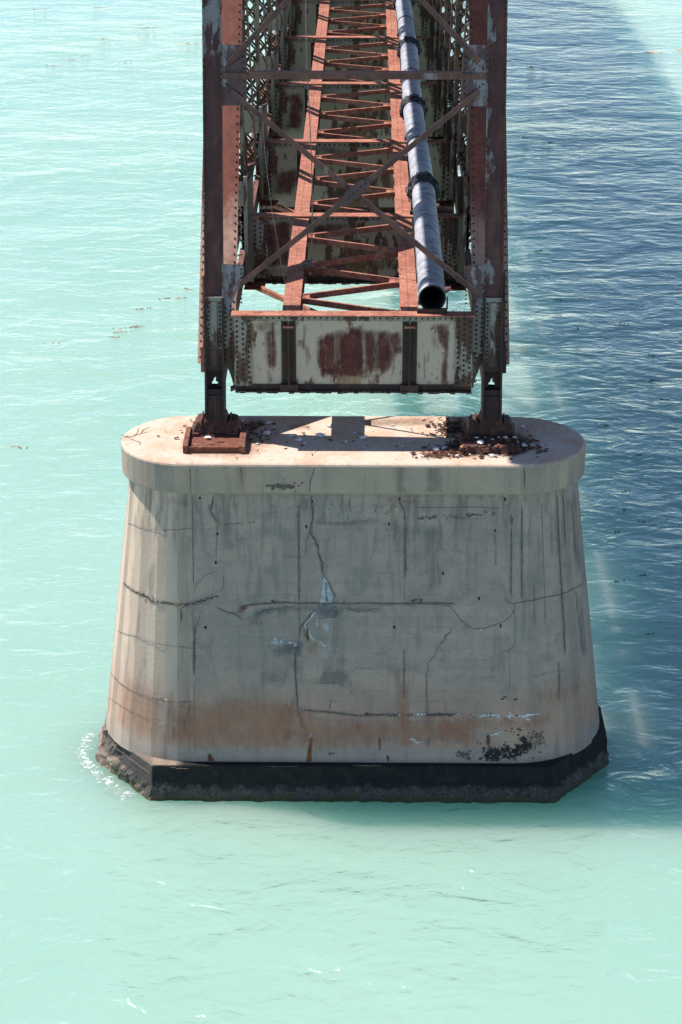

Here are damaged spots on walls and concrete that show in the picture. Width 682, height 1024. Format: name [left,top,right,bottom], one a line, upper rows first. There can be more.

rust [288,95,303,128]
rust [278,171,297,193]
rust [268,222,289,266]
rust [267,326,276,367]
rust [319,329,399,375]
rust [428,417,524,457]
spalling [304,578,339,641]
crack [110,467,583,743]
damp [458,728,541,762]